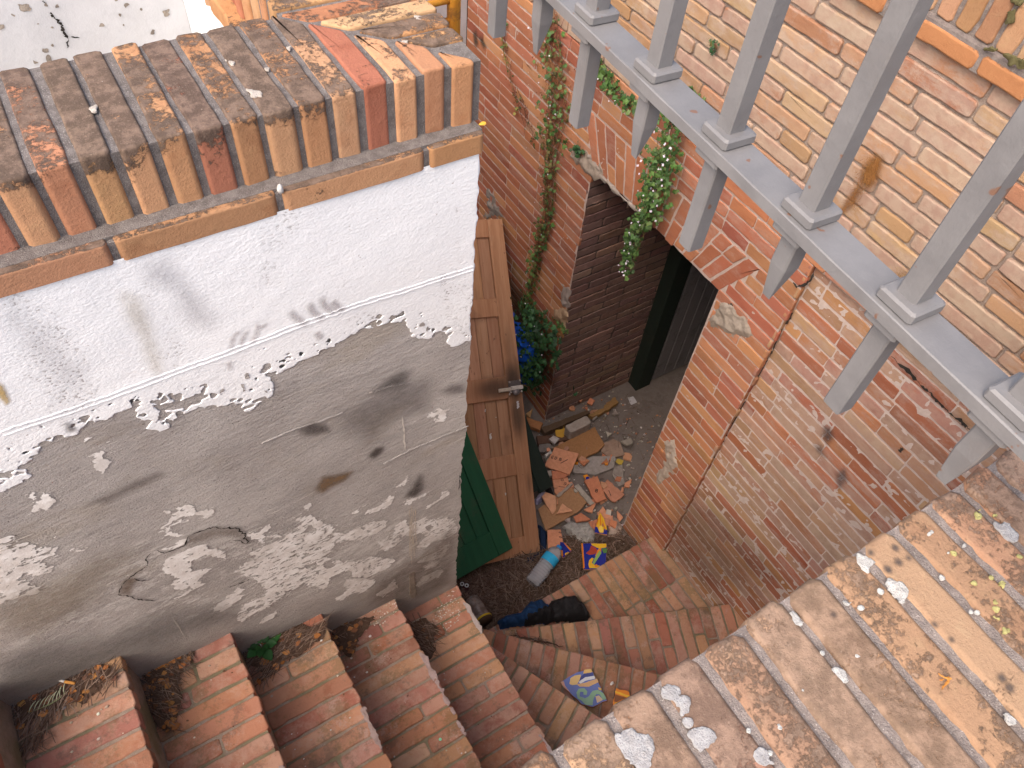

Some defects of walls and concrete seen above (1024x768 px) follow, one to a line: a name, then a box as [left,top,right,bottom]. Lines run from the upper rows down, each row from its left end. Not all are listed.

rust [841,156,882,212]
spalling [708,302,753,338]
crack [714,313,793,458]
crack [891,356,970,430]
peeling [0,312,471,706]
crack [118,527,253,601]